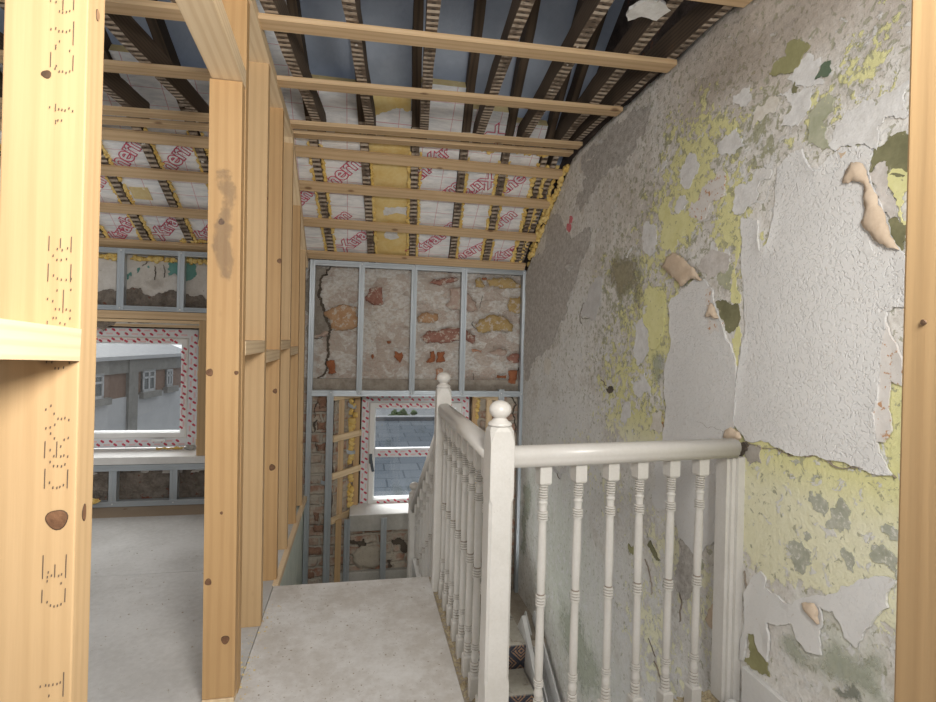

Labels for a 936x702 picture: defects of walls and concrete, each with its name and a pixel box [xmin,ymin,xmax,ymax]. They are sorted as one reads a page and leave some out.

peeling [732,39,910,255]
peeling [625,152,773,258]
crack [314,267,332,378]
flaking render [305,266,358,338]
flaking render [365,286,384,305]
peeling [620,285,667,426]
peeling [697,237,742,365]
crack [747,442,863,469]
peeling [808,475,851,533]
peeling [788,531,812,575]
peeling [869,523,898,579]
peeling [744,634,770,677]